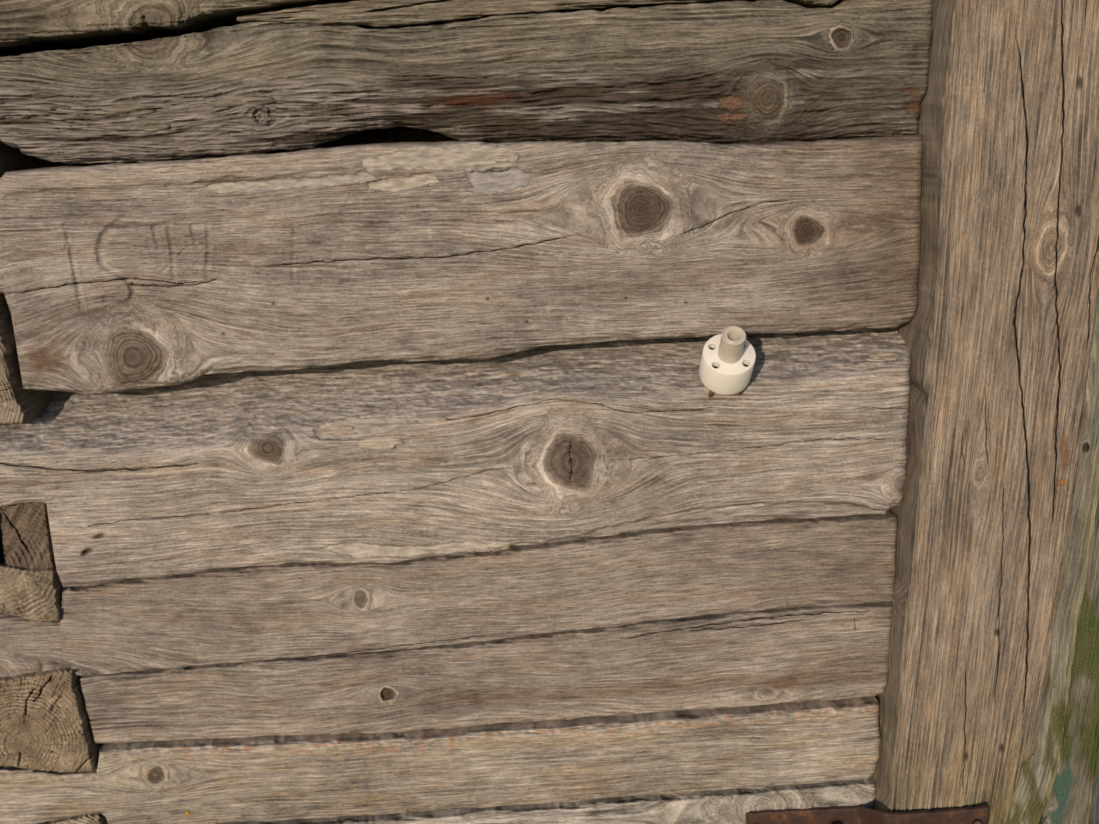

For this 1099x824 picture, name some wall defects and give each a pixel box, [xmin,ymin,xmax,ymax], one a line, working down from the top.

crack [251,237,565,268]
crack [2,277,221,294]
crack [962,2,1087,713]